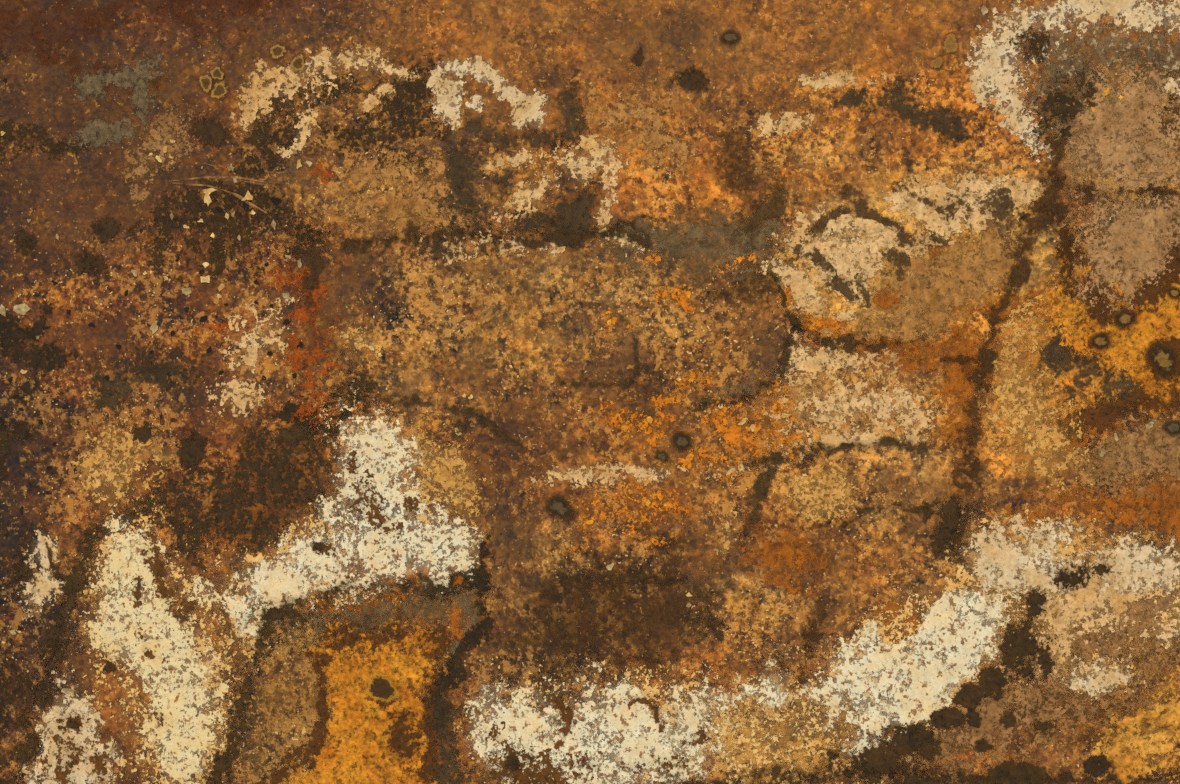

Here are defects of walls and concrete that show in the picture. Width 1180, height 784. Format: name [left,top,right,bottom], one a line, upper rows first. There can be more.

water stain [244,48,788,299]
water stain [791,183,949,308]
water stain [892,181,1015,222]
rust [776,219,1180,452]
water stain [0,526,46,607]
crack [6,534,93,780]
crack [206,573,453,784]
rust [255,589,464,784]
rust [485,718,711,784]
crack [661,750,997,784]
rust [852,562,1112,784]
crack [1044,772,1180,784]